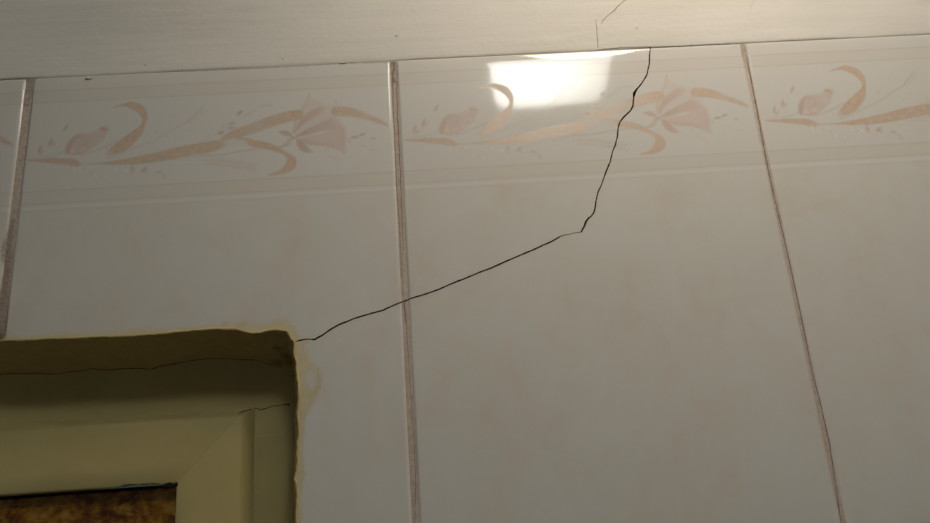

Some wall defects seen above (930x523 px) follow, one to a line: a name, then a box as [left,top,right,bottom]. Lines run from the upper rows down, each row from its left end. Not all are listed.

crack [595,0,626,48]
crack [292,47,651,523]